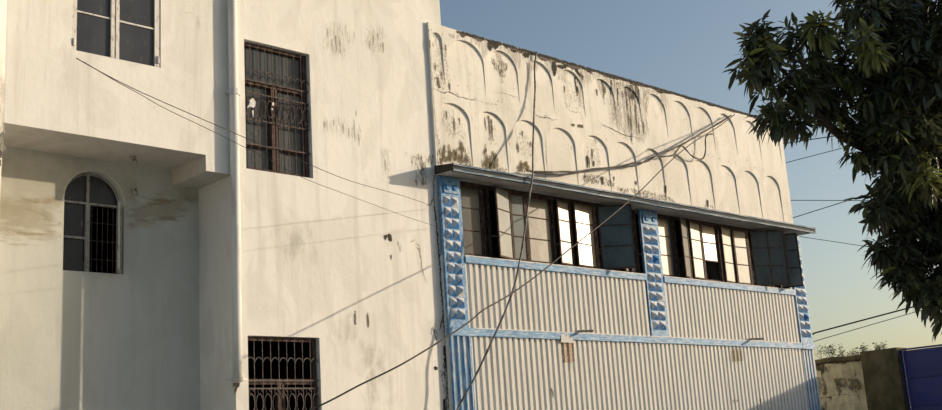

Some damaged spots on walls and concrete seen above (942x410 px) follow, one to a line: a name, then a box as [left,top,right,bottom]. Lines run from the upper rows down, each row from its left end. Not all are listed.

water stain [457,31,764,140]
water stain [437,130,471,166]